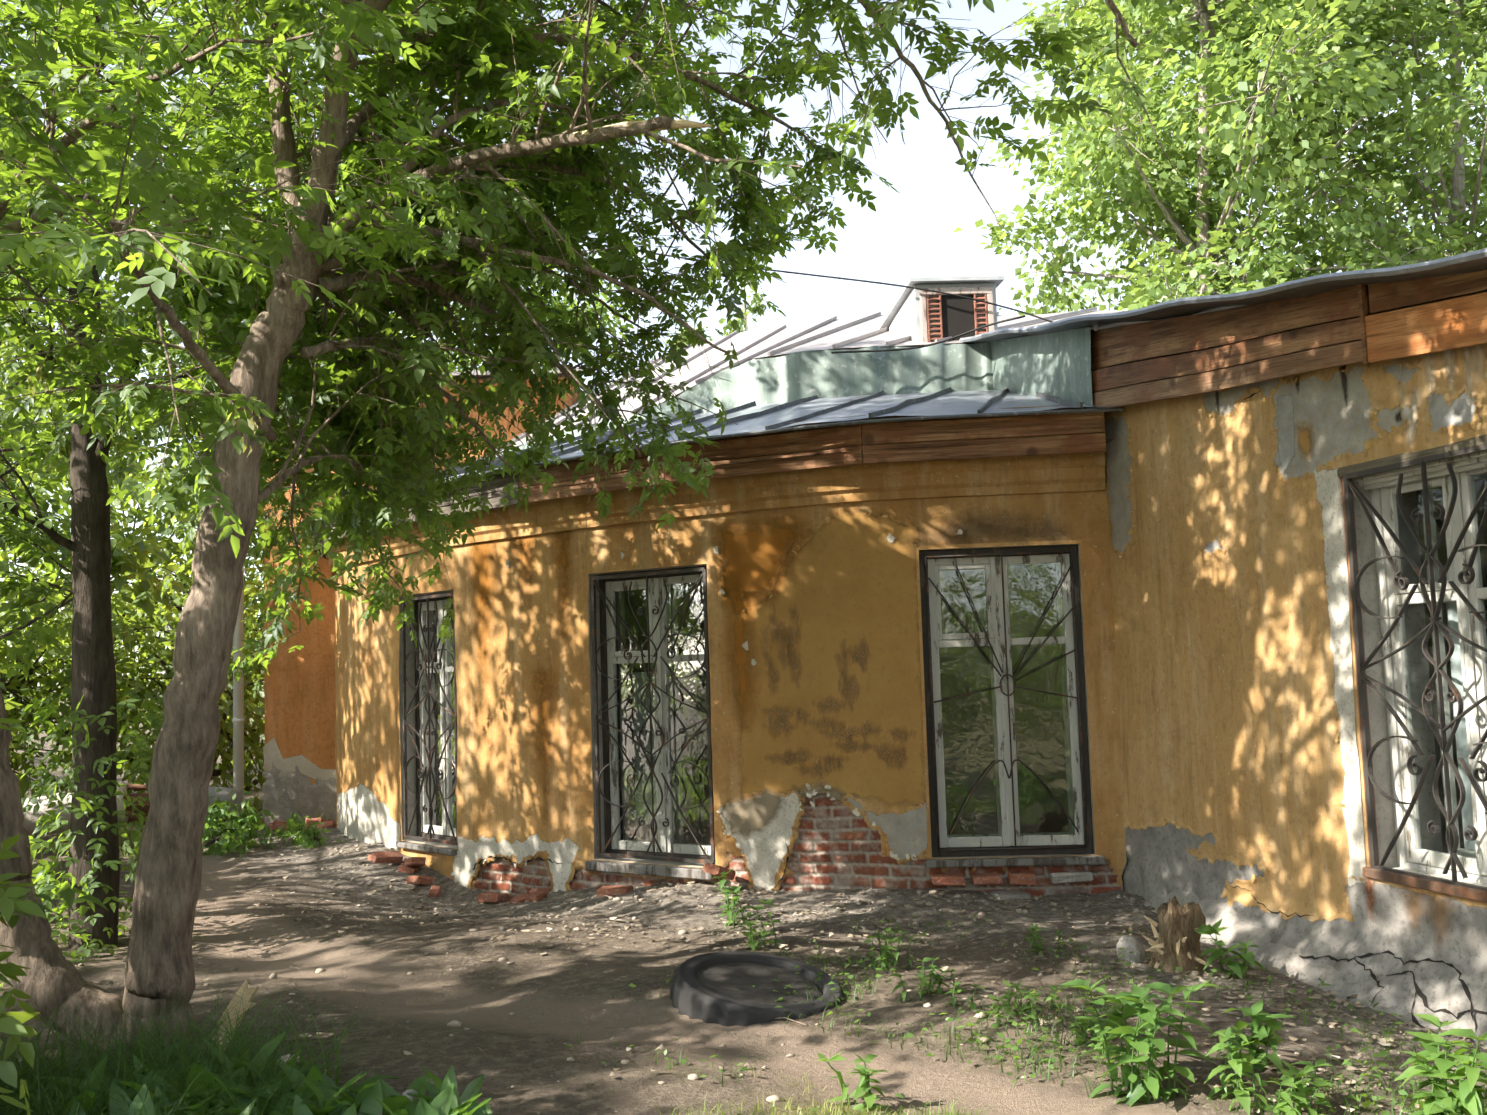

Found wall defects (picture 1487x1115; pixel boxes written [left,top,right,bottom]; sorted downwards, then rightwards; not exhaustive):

peeling [451,350,1487,1045]
spalling [262,737,402,853]
crack [1229,885,1313,917]
crack [1299,950,1487,1033]